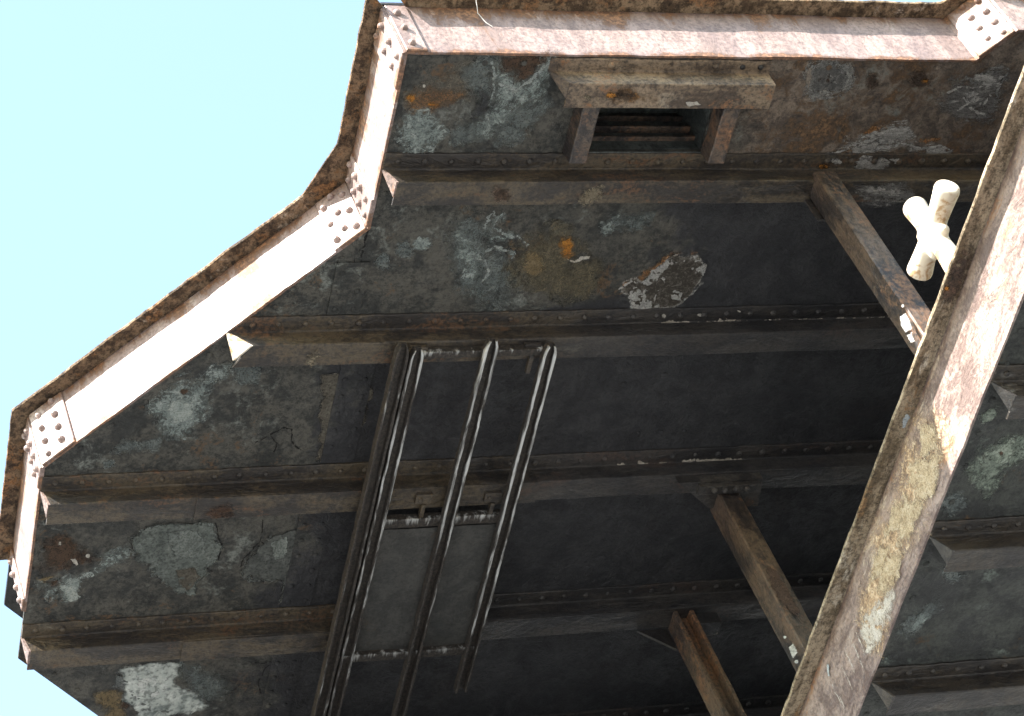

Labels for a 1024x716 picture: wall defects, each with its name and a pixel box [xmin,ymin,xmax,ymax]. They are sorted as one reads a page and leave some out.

rust [405,85,466,115]
leakage [397,53,559,154]
rust [504,221,602,302]
peeling [618,254,707,318]
crack [255,427,301,453]
leakage [982,408,997,423]
leakage [967,435,1024,498]
crack [195,520,264,593]
rust [858,410,950,652]